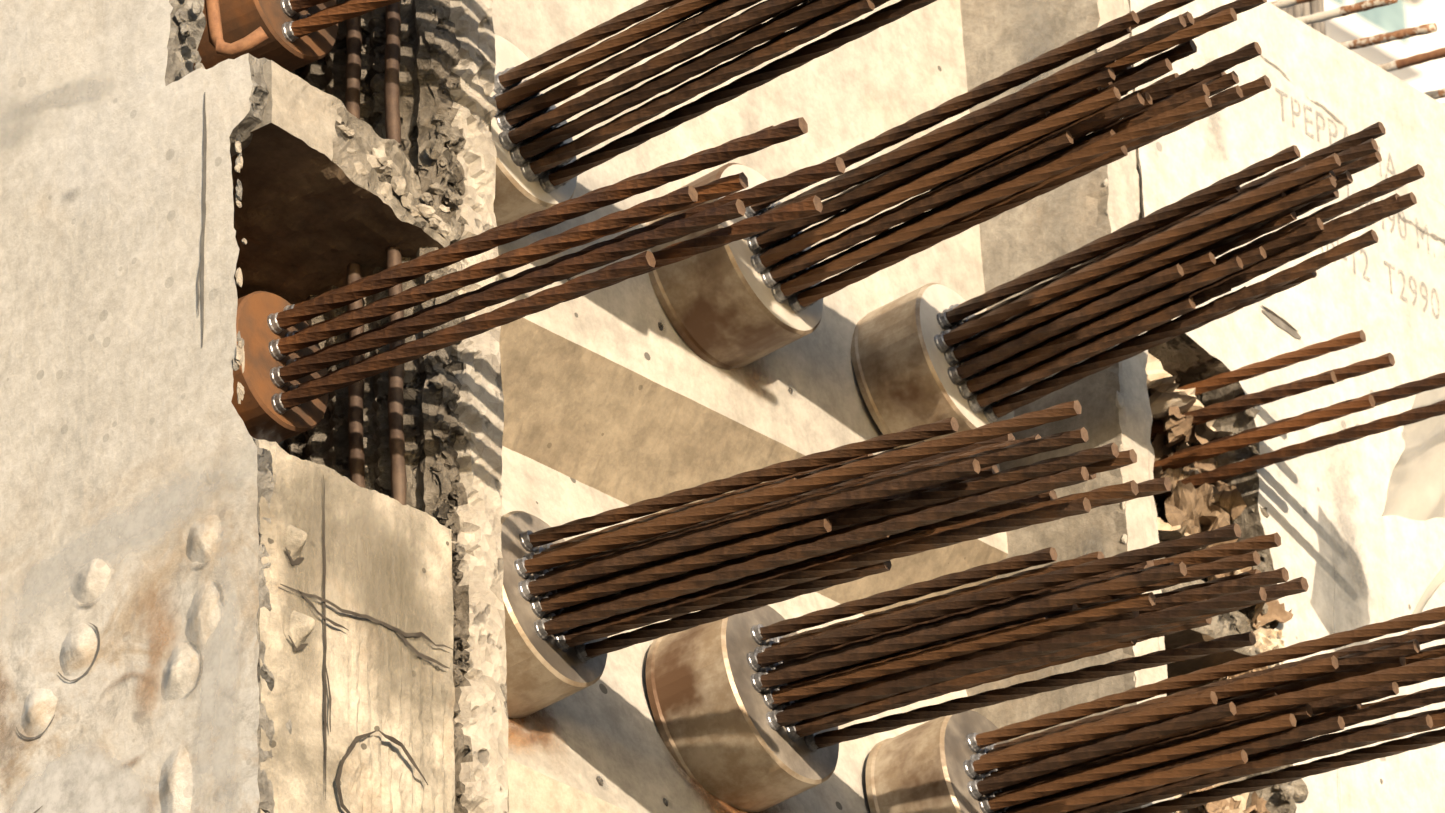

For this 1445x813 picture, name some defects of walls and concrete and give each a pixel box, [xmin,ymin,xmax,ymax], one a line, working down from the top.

spalling [175,0,268,79]
spalling [338,1,469,243]
spalling [234,132,243,208]
crack [197,92,207,346]
spalling [235,267,243,287]
spalling [232,331,245,404]
spalling [347,379,366,488]
spalling [427,346,470,734]
crack [280,475,454,813]
spalling [1261,603,1281,639]
spalling [454,781,468,813]
spalling [1273,764,1309,813]